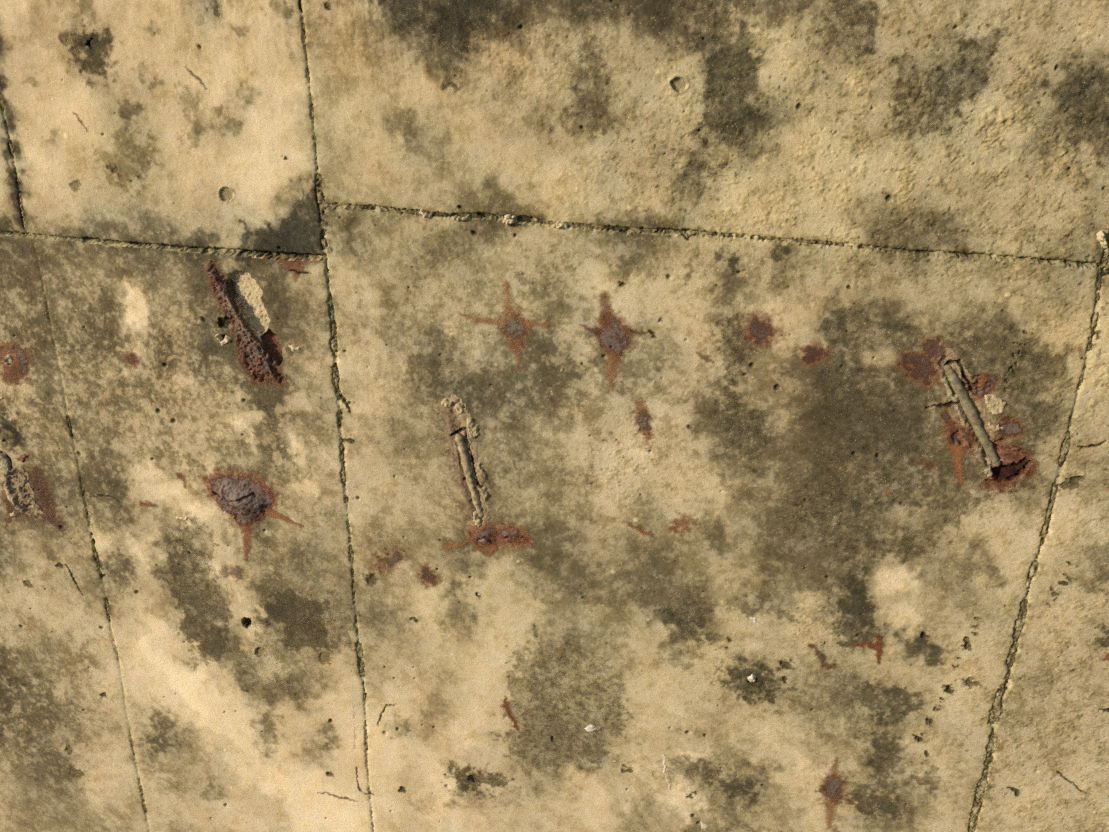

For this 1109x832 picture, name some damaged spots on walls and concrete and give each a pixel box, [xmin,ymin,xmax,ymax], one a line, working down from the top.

leakage [377,0,528,90]
leakage [675,0,765,184]
rust [0,343,30,385]
spalling [0,451,64,532]
spalling [204,263,300,386]
spalling [440,395,490,527]
rust [459,282,550,368]
rust [580,293,646,386]
leakage [711,314,773,473]
leakage [784,303,1059,563]
spalling [898,337,1033,490]
rust [815,758,858,828]